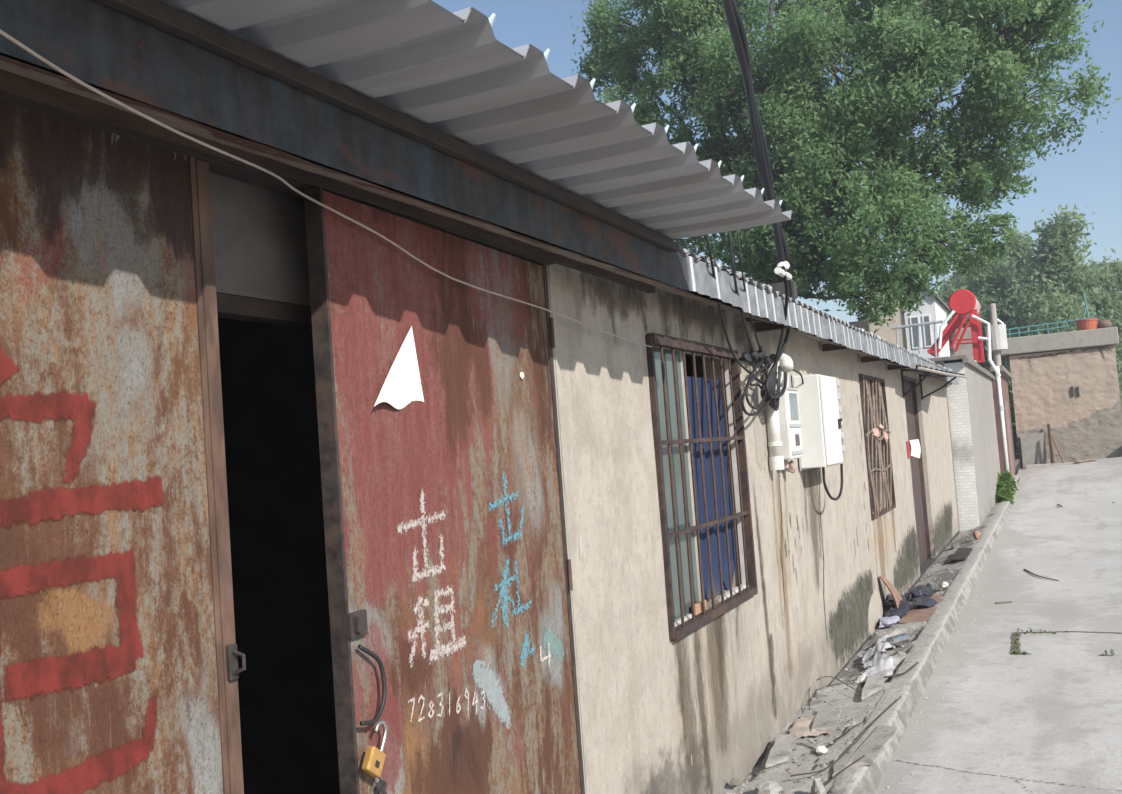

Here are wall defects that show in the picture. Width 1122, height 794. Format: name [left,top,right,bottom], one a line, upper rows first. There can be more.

leakage [894,528,919,594]
leakage [933,504,957,565]
leakage [829,570,873,663]
leakage [650,589,738,794]